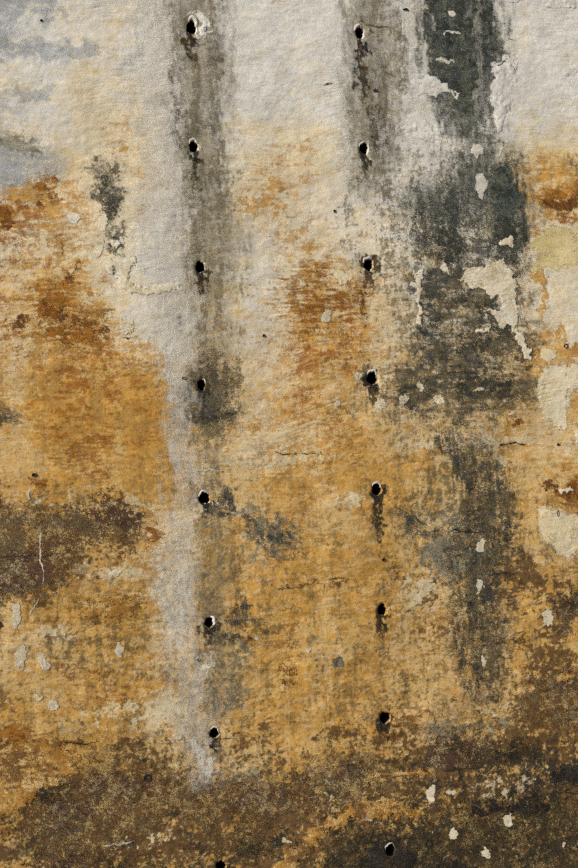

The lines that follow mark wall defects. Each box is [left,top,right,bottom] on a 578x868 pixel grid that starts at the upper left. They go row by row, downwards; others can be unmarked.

damp [336,0,408,186]
damp [84,156,127,260]
damp [130,0,237,484]
peeling [499,235,514,248]
rust [535,185,578,224]
rust [5,261,110,336]
rust [267,260,367,336]
damp [361,0,578,711]
peeling [458,258,578,442]
damp [195,461,237,537]
peeling [538,504,578,558]
rust [539,476,578,506]